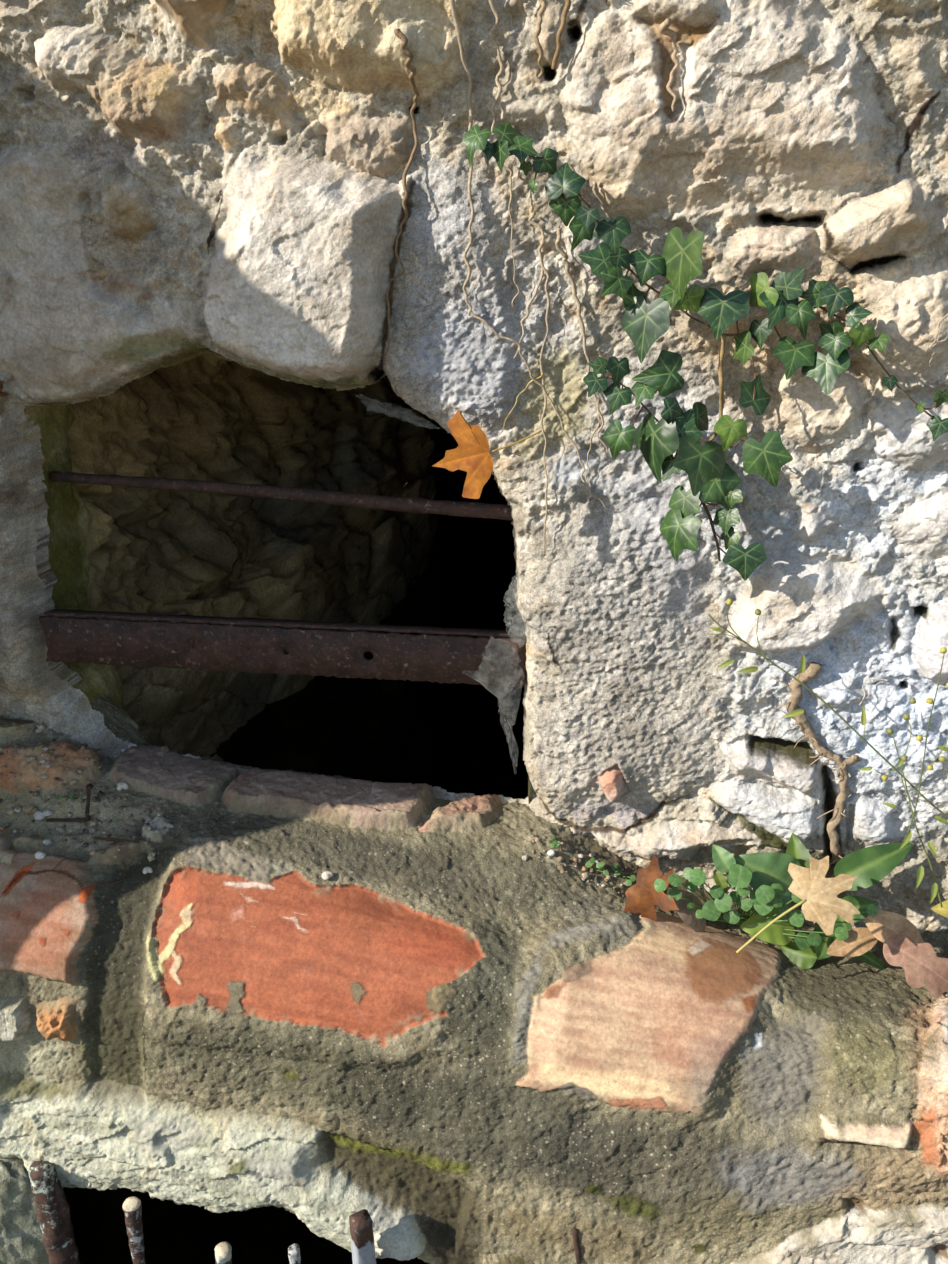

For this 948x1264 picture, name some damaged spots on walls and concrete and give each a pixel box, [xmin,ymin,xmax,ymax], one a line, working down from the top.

crack [206,193,223,254]
spalling [0,851,46,896]
spalling [78,886,94,903]
peeling [425,983,456,1013]
peeling [544,986,562,997]
spalling [559,1083,666,1109]